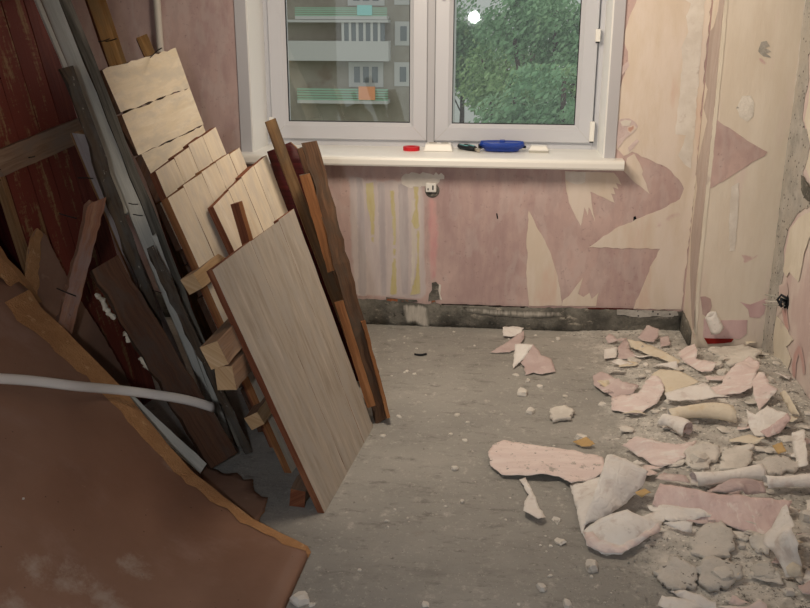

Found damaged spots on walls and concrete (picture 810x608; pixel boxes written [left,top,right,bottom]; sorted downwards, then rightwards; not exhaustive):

spalling [617,309,678,318]
peeling [694,0,728,334]
flaking render [757,41,771,66]
spalling [762,0,810,369]